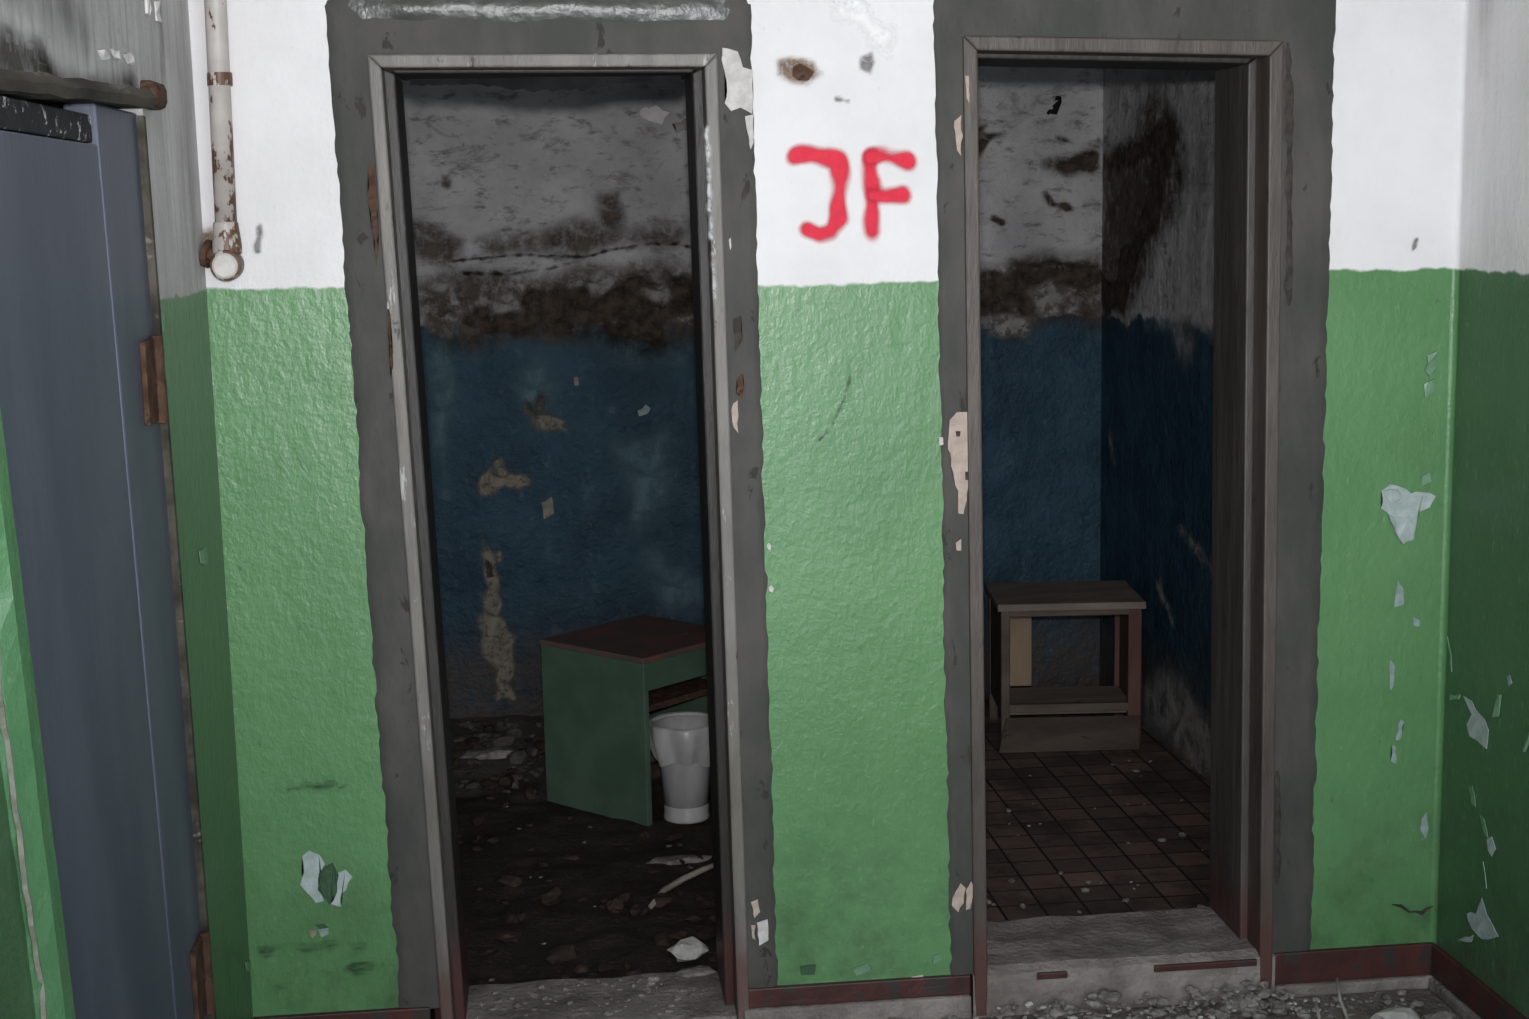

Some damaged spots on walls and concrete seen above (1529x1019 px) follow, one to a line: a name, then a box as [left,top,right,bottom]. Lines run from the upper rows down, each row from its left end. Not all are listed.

peeling [721,48,754,150]
rust [779,59,816,82]
rust [199,231,214,268]
water stain [413,223,460,263]
water stain [487,196,683,255]
peeling [939,412,968,514]
peeling [1381,472,1436,544]
peeling [1449,675,1512,749]
peeling [300,851,352,907]
peeling [751,899,768,946]
peeling [952,882,973,912]
peeling [1458,786,1499,942]